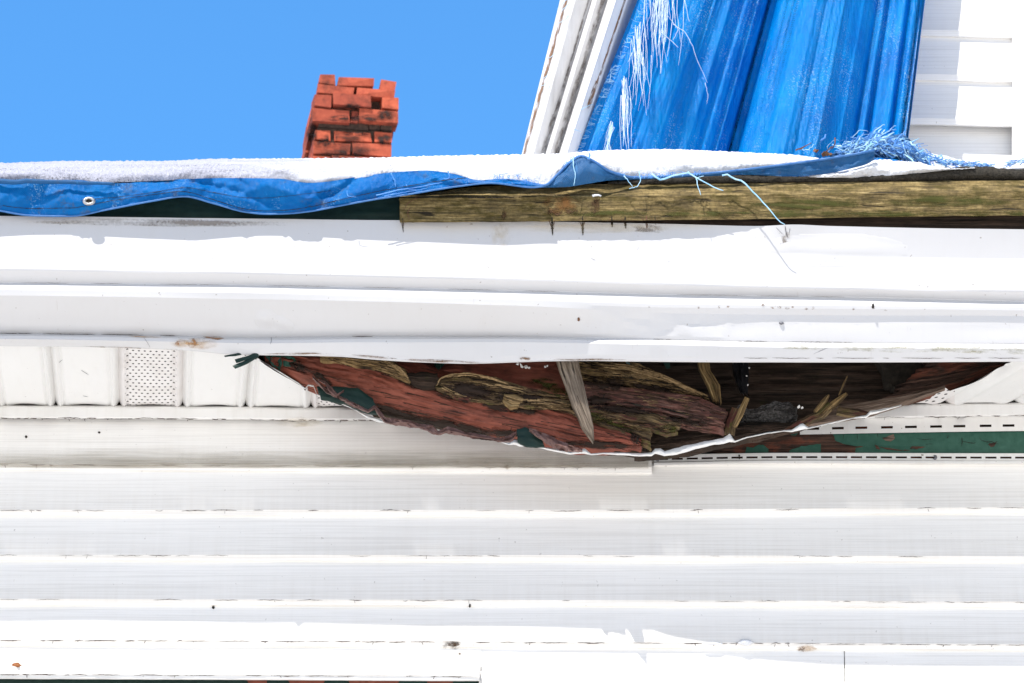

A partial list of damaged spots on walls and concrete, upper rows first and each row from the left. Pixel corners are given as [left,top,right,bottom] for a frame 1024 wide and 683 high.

peeling [260,355,296,371]
peeling [745,444,769,453]
peeling [789,433,821,453]
peeling [833,431,1024,453]